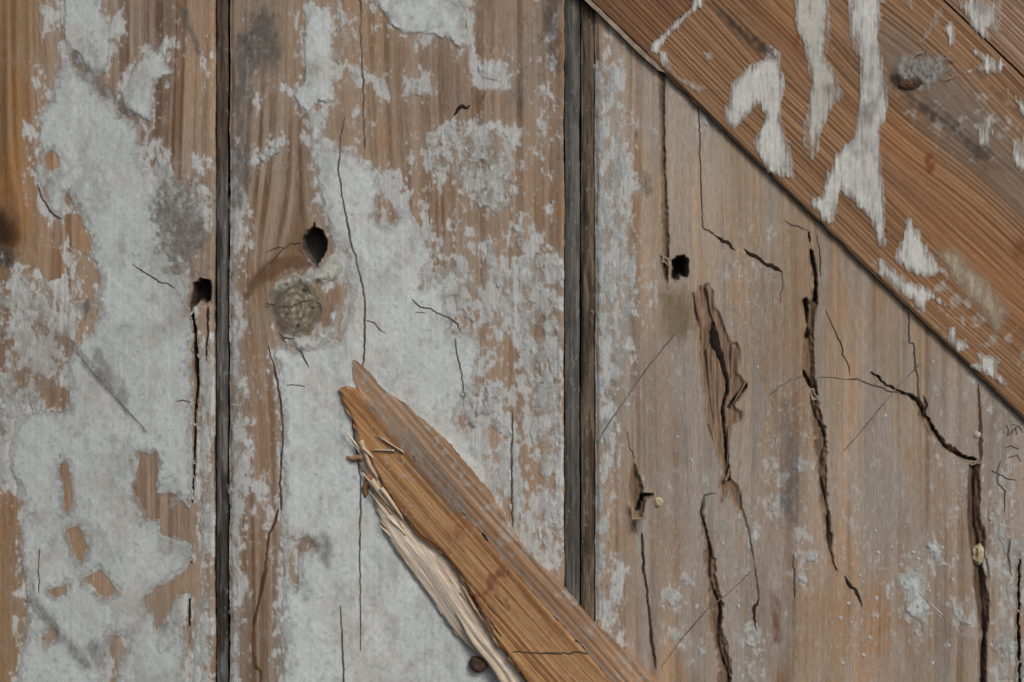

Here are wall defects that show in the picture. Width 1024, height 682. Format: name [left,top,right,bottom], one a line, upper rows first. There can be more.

peeling [10,0,214,682]
crack [133,264,210,504]
crack [337,0,386,365]
peeling [271,0,564,682]
peeling [727,45,792,178]
peeling [794,0,841,159]
peeling [812,0,888,244]
crack [697,107,1023,682]
peeling [879,219,946,313]
peeling [948,327,1007,385]
crack [186,592,194,643]
crack [641,533,657,669]